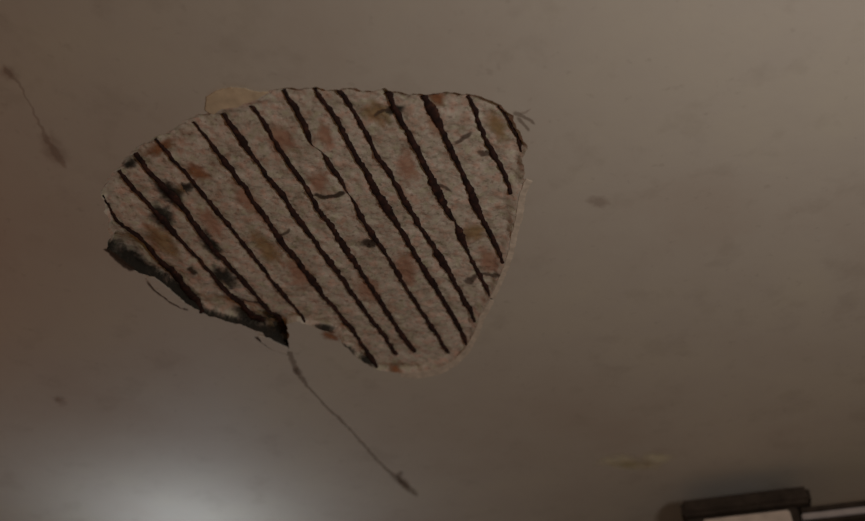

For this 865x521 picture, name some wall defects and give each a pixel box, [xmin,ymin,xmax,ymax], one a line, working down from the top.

spalling [101,87,533,379]